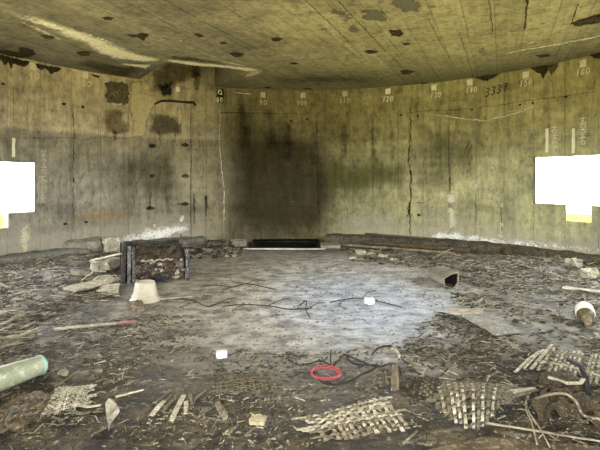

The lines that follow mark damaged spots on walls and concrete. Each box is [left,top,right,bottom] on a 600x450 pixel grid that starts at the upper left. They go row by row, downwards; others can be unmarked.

peeling [332,0,437,32]
spalling [572,14,600,27]
crack [337,0,579,79]
spalling [0,47,61,74]
spalling [531,63,559,78]
peeling [91,74,158,136]
water stain [106,109,127,138]
water stain [151,115,181,136]
water stain [236,118,328,226]
crack [403,92,592,234]
water stain [123,216,188,241]
water stain [431,194,598,251]